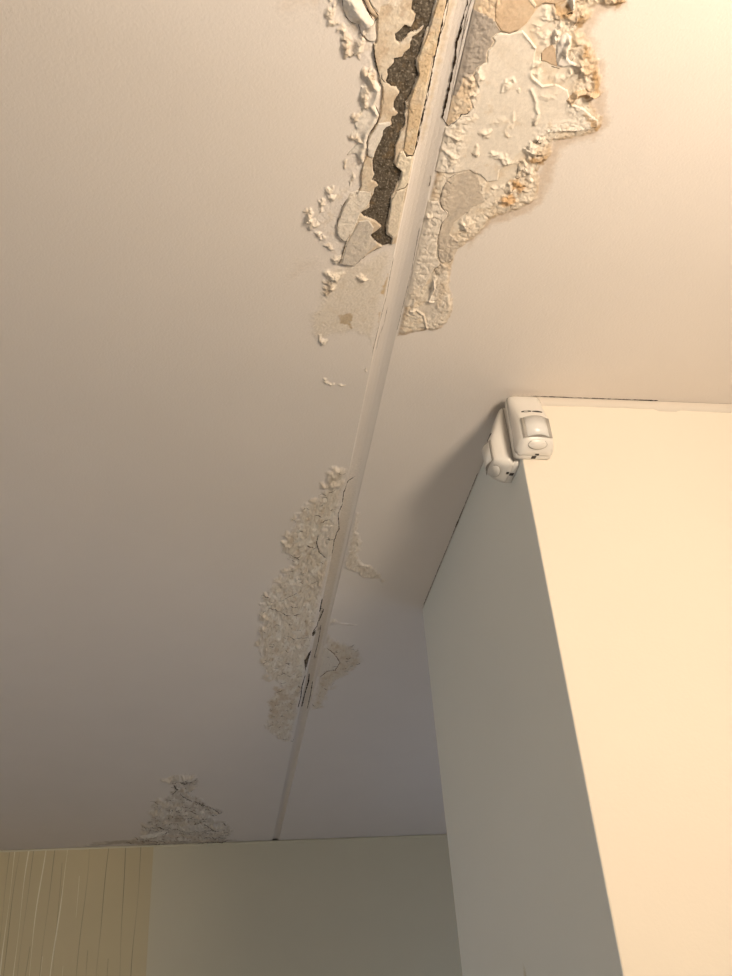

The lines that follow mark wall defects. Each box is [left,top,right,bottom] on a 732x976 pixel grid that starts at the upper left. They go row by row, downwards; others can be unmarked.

crack [342,0,390,156]
peeling [291,0,446,265]
crack [370,175,461,349]
crack [404,0,471,157]
peeling [395,0,616,340]
leakage [463,0,631,261]
peeling [253,465,364,743]
crack [261,474,358,742]
peeling [83,773,258,847]